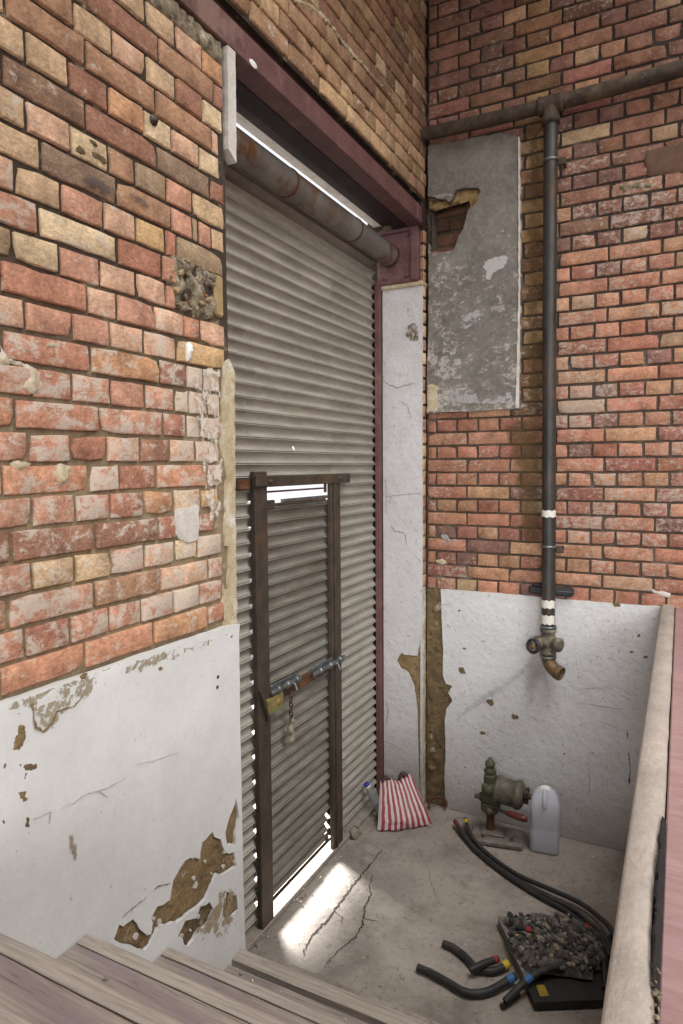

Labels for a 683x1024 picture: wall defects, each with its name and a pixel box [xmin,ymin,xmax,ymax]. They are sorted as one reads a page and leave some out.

spalling [428,190,481,253]
spalling [166,255,223,320]
flaking render [9,634,233,750]
flaking render [398,586,452,807]
flaking render [19,764,37,802]
spalling [114,805,237,949]
crack [303,850,382,968]